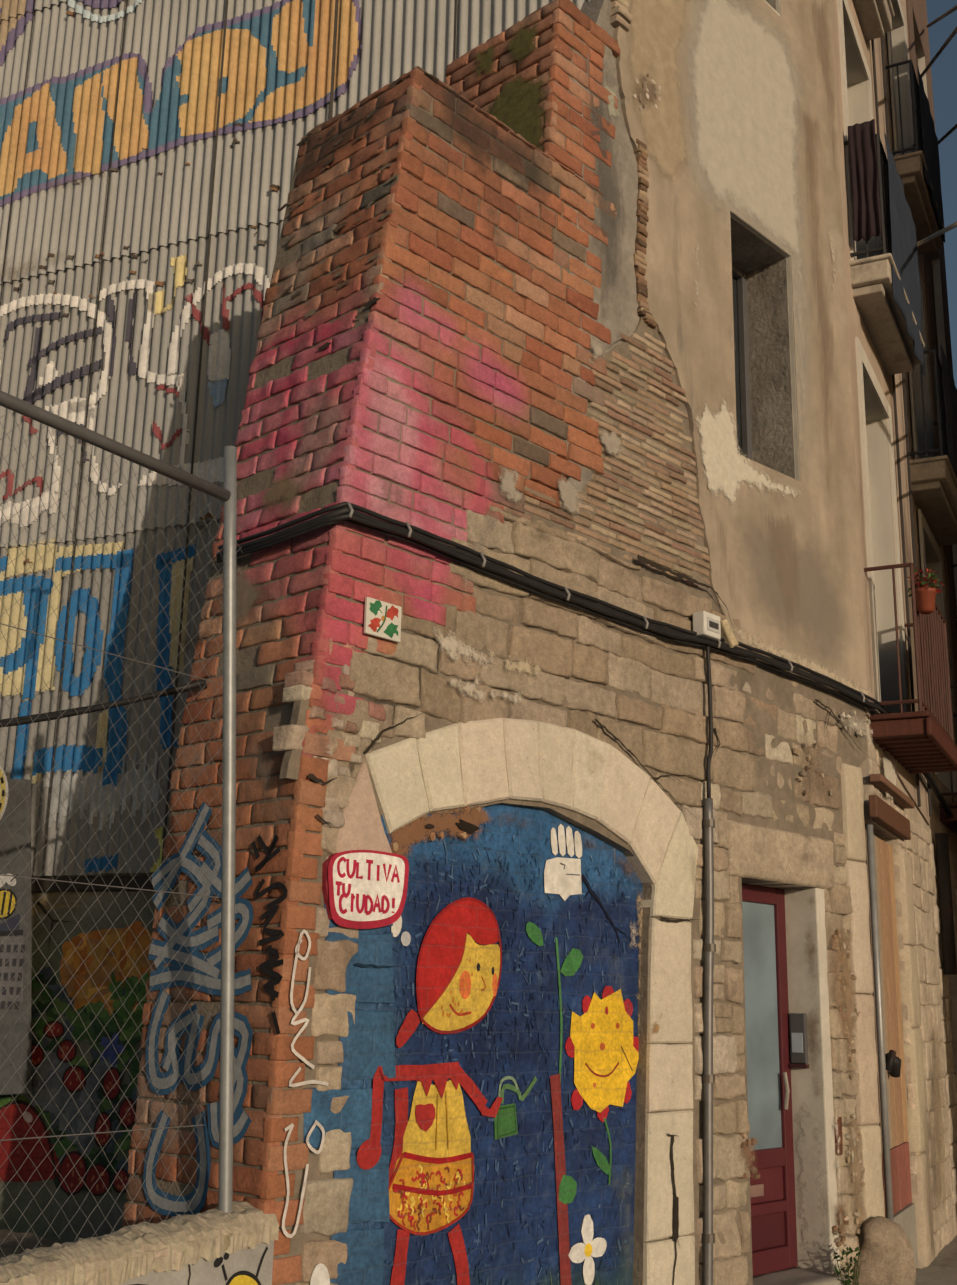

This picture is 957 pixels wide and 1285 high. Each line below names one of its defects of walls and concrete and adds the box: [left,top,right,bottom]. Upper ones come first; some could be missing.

flaking render [502,139,711,587]
crack [668,1133,679,1195]
crack [672,1239,680,1285]